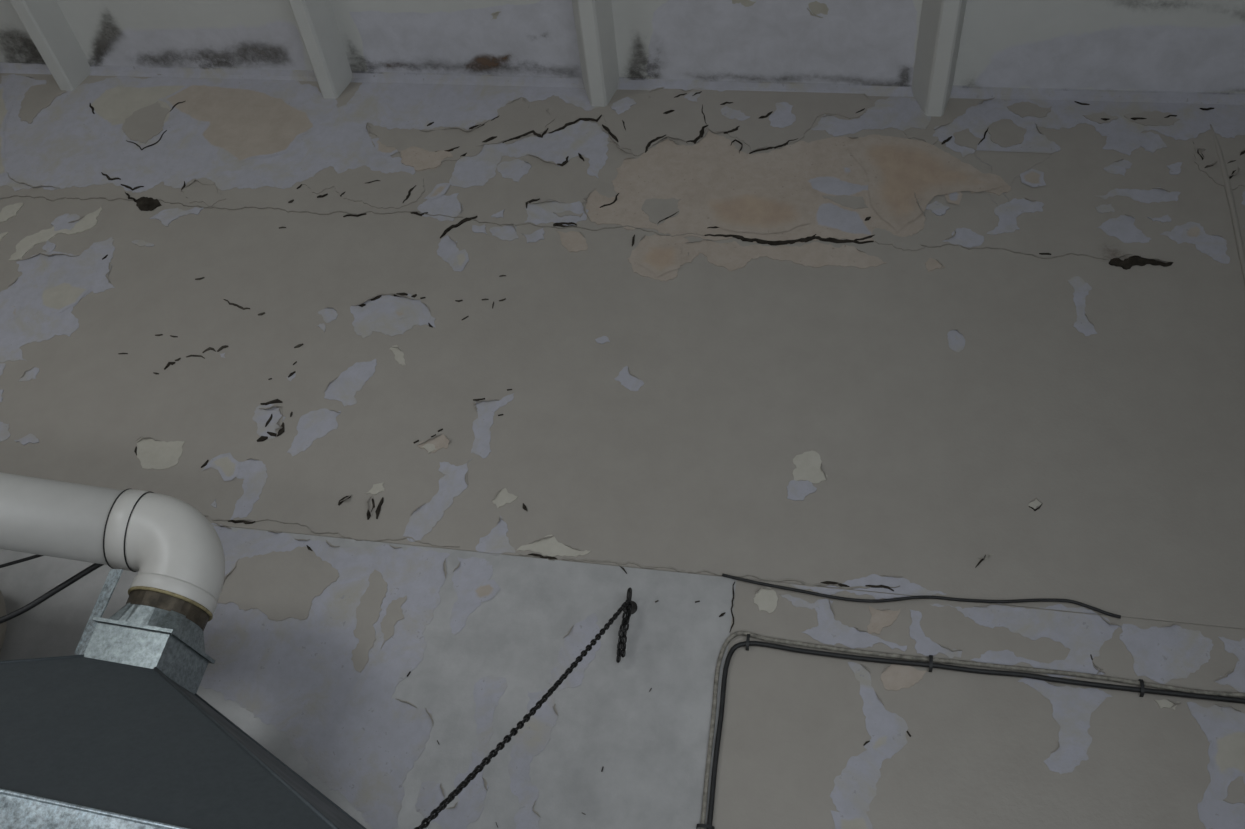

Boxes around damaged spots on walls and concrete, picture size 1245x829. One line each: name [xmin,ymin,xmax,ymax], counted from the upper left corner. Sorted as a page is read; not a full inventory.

water stain [86,15,313,70]
water stain [346,0,582,77]
crack [0,195,876,246]
peeling [0,74,1245,402]
crack [919,243,1109,260]
peeling [252,359,377,456]
peeling [134,436,185,470]
peeling [787,451,827,501]
peeling [475,488,591,557]
peeling [200,389,514,829]
peeling [508,613,602,829]
peeling [753,574,1245,829]